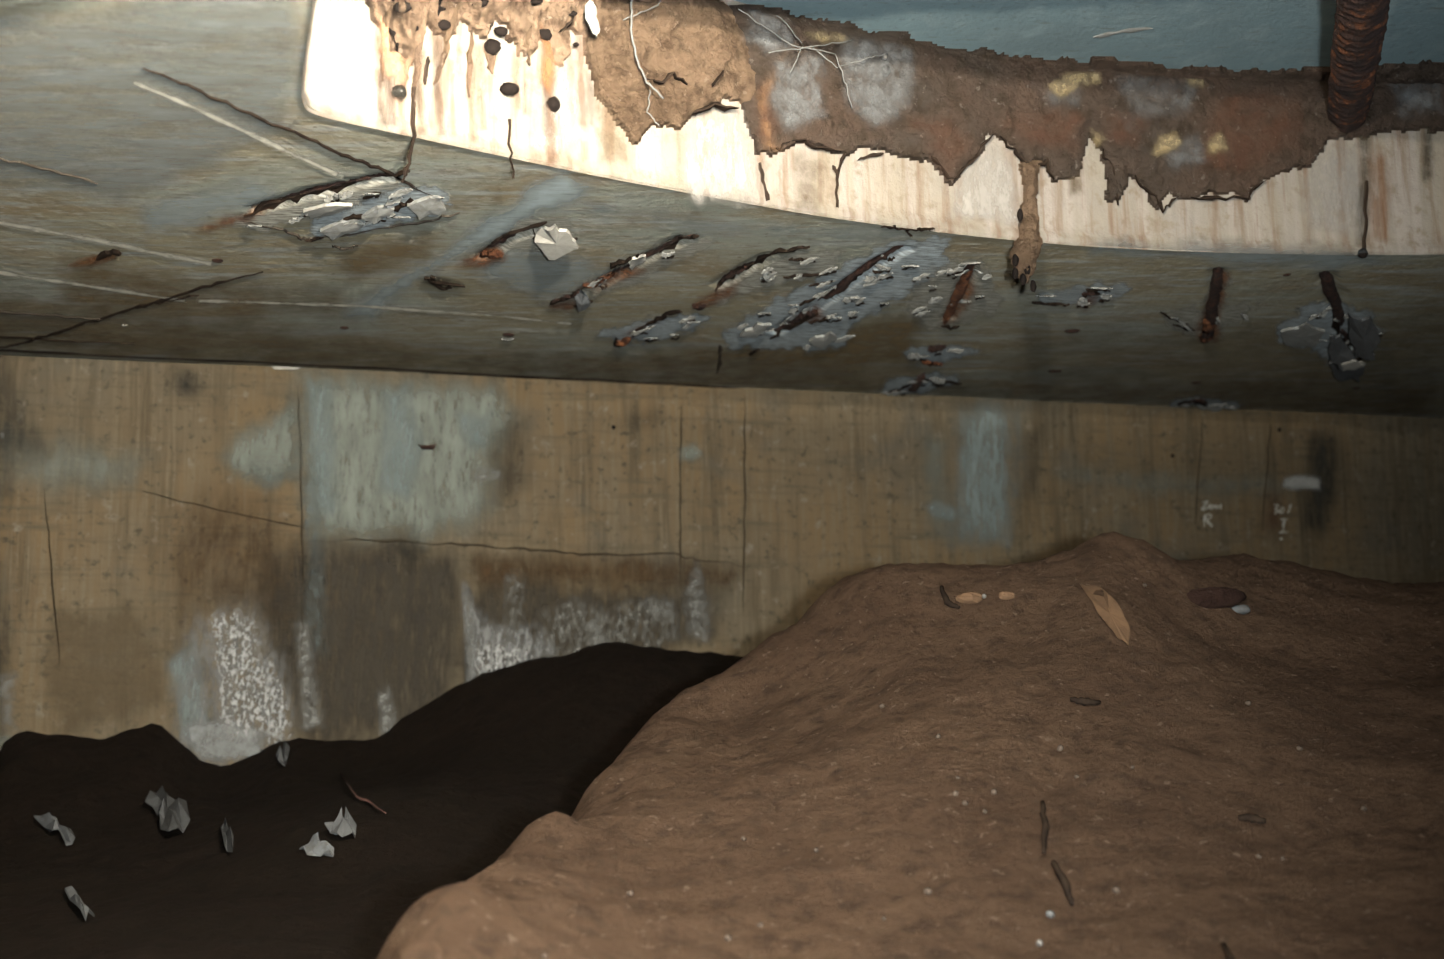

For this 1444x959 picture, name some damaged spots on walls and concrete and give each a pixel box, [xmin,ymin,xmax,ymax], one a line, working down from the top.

rust [382,22,402,75]
spalling [484,23,508,56]
spalling [539,29,552,41]
rust [542,40,554,88]
peeling [569,0,600,47]
crack [143,67,460,250]
spalling [207,169,452,242]
spalling [466,217,578,265]
spalling [550,233,712,312]
spalling [598,235,1002,396]
crack [0,271,754,666]
water stain [172,376,734,760]